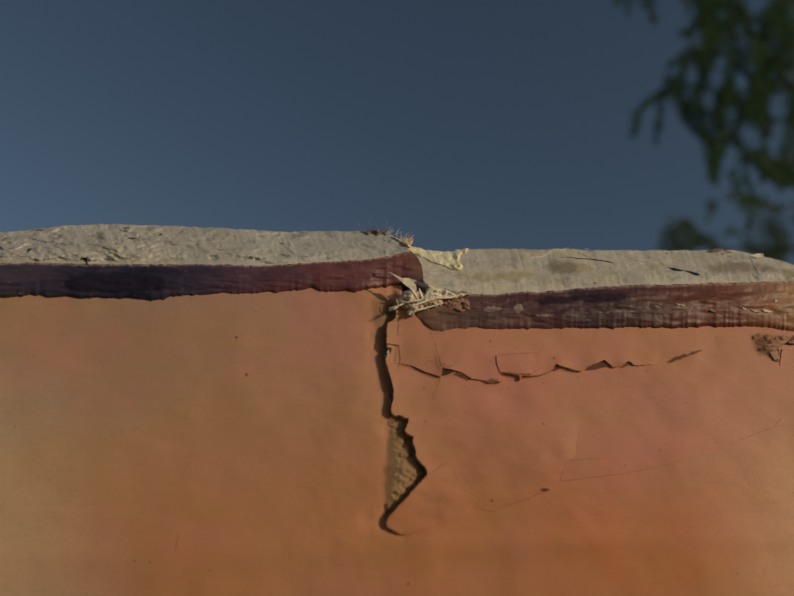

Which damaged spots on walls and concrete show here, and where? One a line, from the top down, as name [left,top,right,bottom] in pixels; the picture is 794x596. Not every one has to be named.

peeling [0,251,794,535]